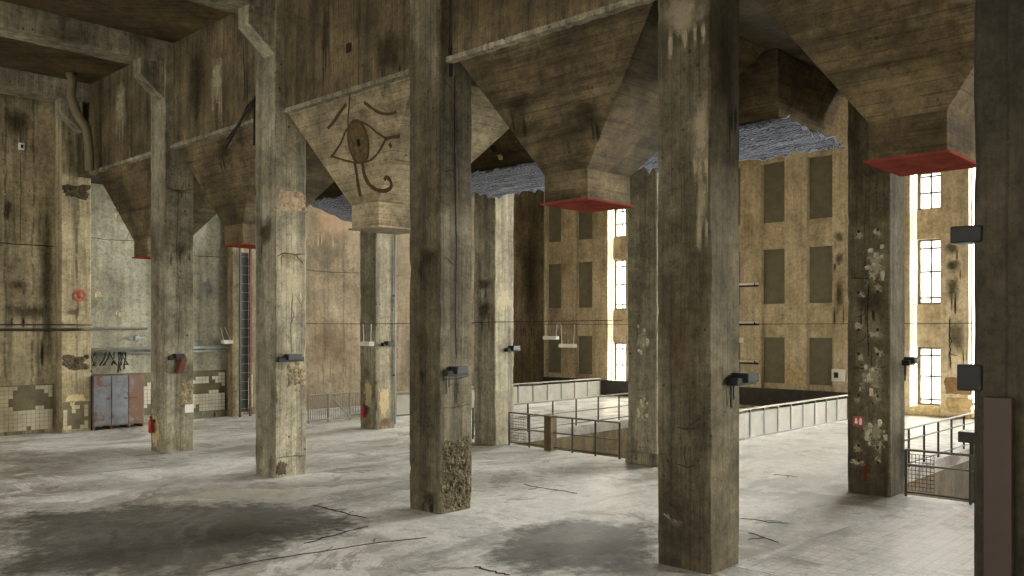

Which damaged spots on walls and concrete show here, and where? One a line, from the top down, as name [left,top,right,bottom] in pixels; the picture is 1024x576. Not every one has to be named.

spalling [62,184,91,200]
peeling [855,228,885,297]
damp [948,245,961,310]
spalling [0,384,90,433]
spalling [140,372,151,415]
spalling [180,370,226,412]
spalling [287,361,306,387]
peeling [351,379,390,417]
peeling [854,322,883,403]
peeling [850,419,887,464]
spalling [441,435,472,511]
crack [205,505,427,573]